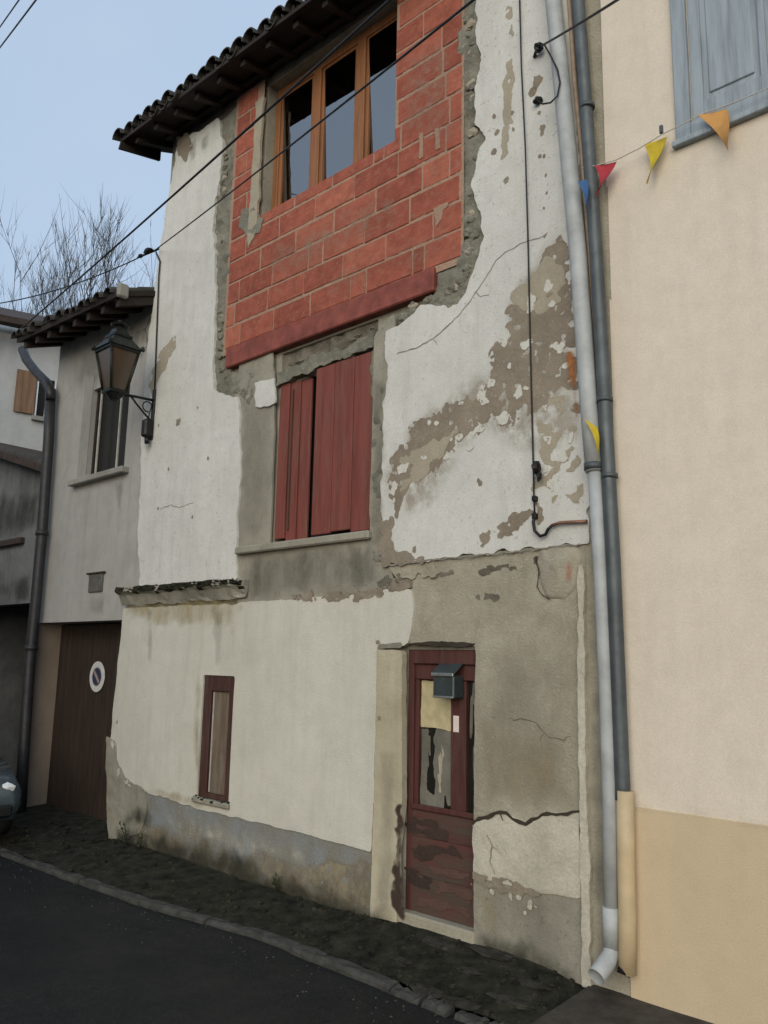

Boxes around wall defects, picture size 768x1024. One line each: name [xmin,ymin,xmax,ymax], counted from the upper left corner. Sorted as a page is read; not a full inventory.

spalling [528,75,543,97]
spalling [397,0,515,322]
spalling [214,109,277,408]
crack [397,232,548,354]
peeling [291,234,584,602]
spalling [376,640,402,649]
crack [491,717,571,742]
leakage [118,833,375,918]
spalling [404,817,540,915]
crack [471,810,579,874]